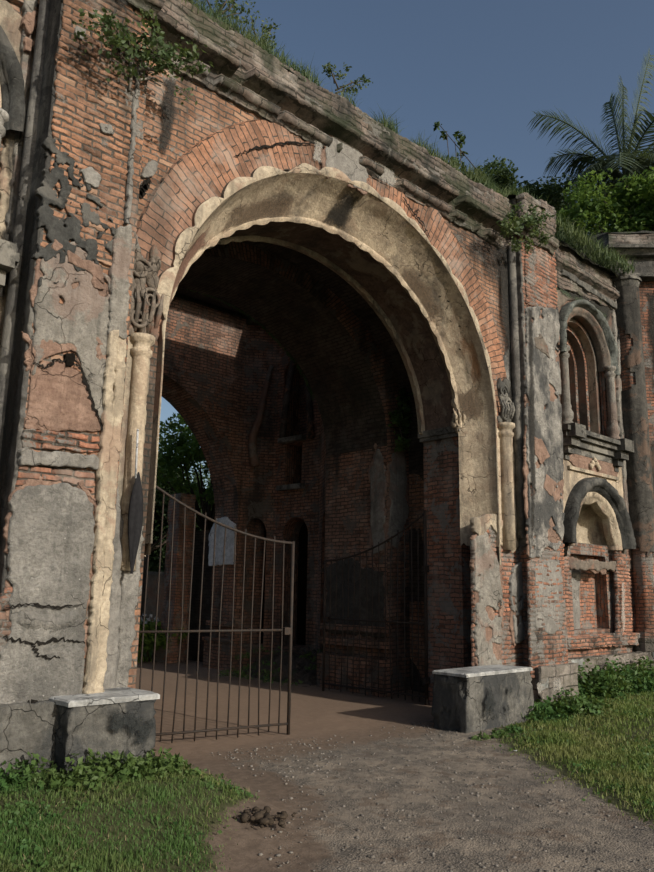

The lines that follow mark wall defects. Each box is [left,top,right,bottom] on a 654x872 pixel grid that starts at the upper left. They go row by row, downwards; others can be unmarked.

damp [159,78,176,153]
flaking render [49,0,142,290]
crack [235,141,317,157]
flaking render [141,160,158,178]
damp [324,193,359,228]
flaking render [21,339,101,453]
flaking render [534,436,550,464]
flaking render [470,514,503,536]
crack [6,602,84,610]
crack [3,635,85,660]